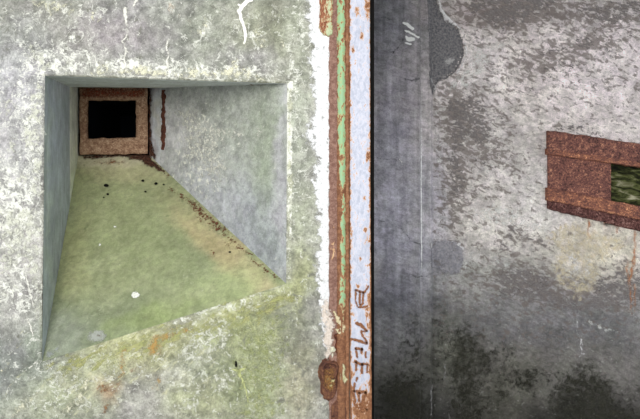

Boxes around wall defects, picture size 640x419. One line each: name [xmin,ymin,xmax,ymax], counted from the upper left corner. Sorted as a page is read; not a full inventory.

spalling [427,0,467,94]
corrosion [83,89,169,177]
corrosion [168,187,276,281]
corrosion [331,400,346,419]
water stain [445,325,494,419]
water stain [552,359,640,419]